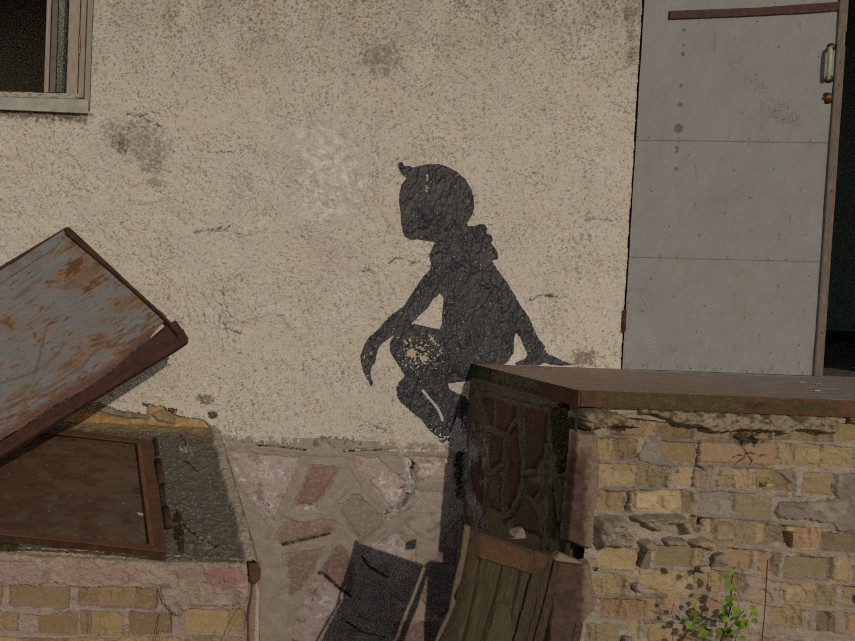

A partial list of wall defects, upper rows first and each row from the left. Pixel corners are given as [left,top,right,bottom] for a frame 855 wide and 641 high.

spalling [568,405,855,436]
spalling [632,490,680,510]
spalling [631,551,729,597]